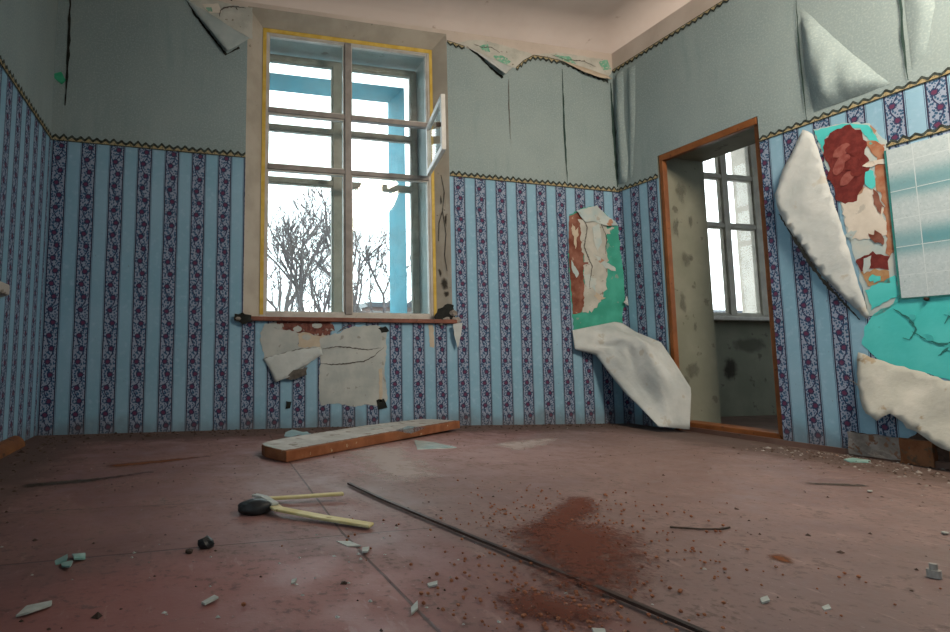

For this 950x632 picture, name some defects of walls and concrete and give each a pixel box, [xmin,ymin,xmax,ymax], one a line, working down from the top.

flaking render [187,0,253,56]
spalling [234,312,252,324]
flaking render [260,321,389,410]
peeling [568,205,691,430]
peeling [774,122,950,468]
crack [894,309,950,356]